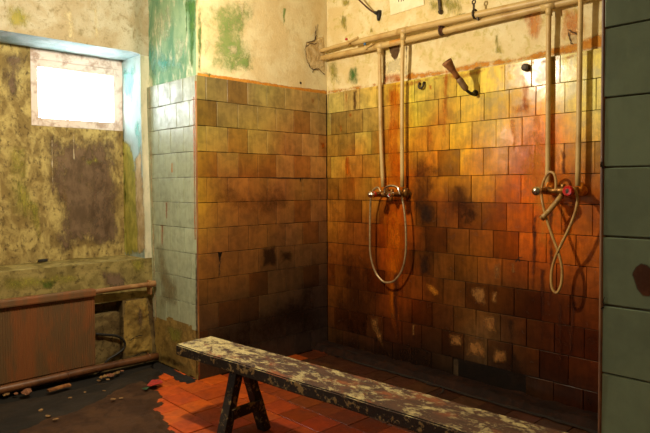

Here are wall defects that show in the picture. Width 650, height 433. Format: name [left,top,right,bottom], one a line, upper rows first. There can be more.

spalling [305,35,325,72]
damp [50,137,117,252]
damp [472,288,497,303]